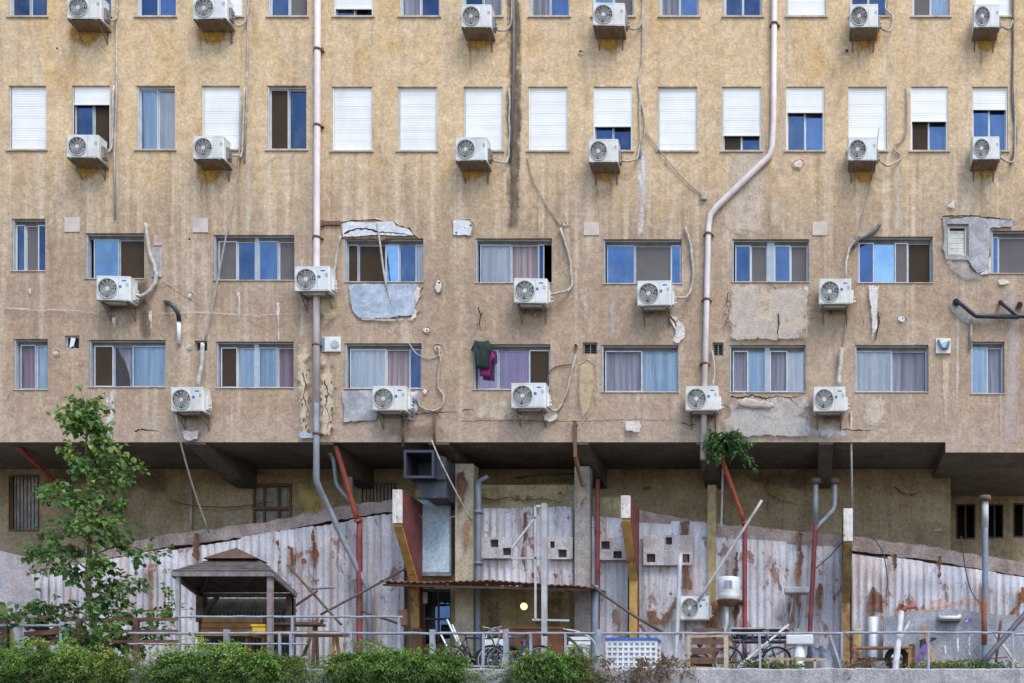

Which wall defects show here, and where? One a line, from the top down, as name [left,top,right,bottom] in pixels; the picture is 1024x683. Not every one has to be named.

damp [507,0,522,227]
flaking render [340,218,418,241]
peeling [725,284,813,340]
crack [300,373,333,430]
peeling [724,392,812,437]
rust [680,520,690,535]
rust [275,527,319,592]
rust [646,554,692,631]
rust [867,585,885,617]